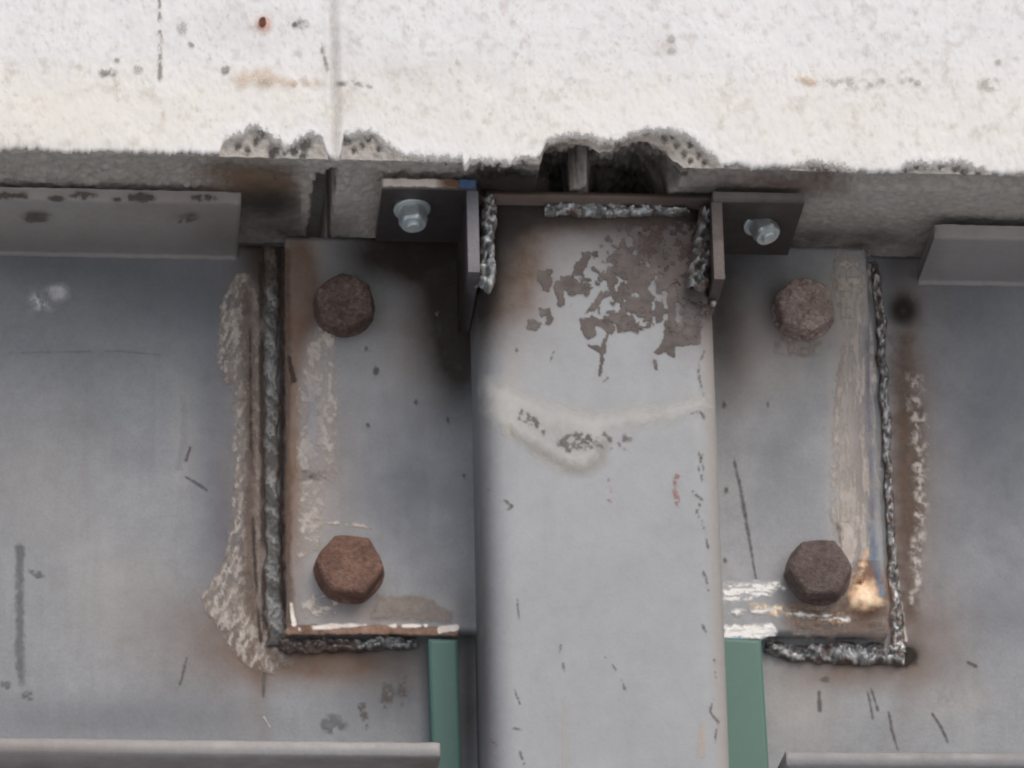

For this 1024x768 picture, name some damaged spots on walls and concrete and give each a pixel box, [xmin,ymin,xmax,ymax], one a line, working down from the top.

spalling [341,126,724,172]
peeling [527,222,713,376]